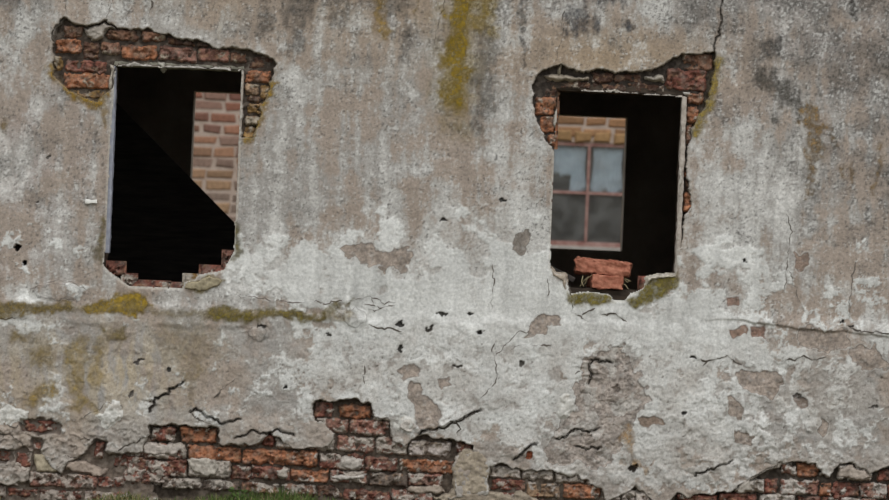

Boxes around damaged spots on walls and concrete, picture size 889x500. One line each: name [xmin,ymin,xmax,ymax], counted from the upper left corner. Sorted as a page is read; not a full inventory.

spalling [52,10,276,138]
water stain [443,0,494,109]
crack [714,0,723,52]
spalling [532,52,716,240]
spalling [0,342,889,500]